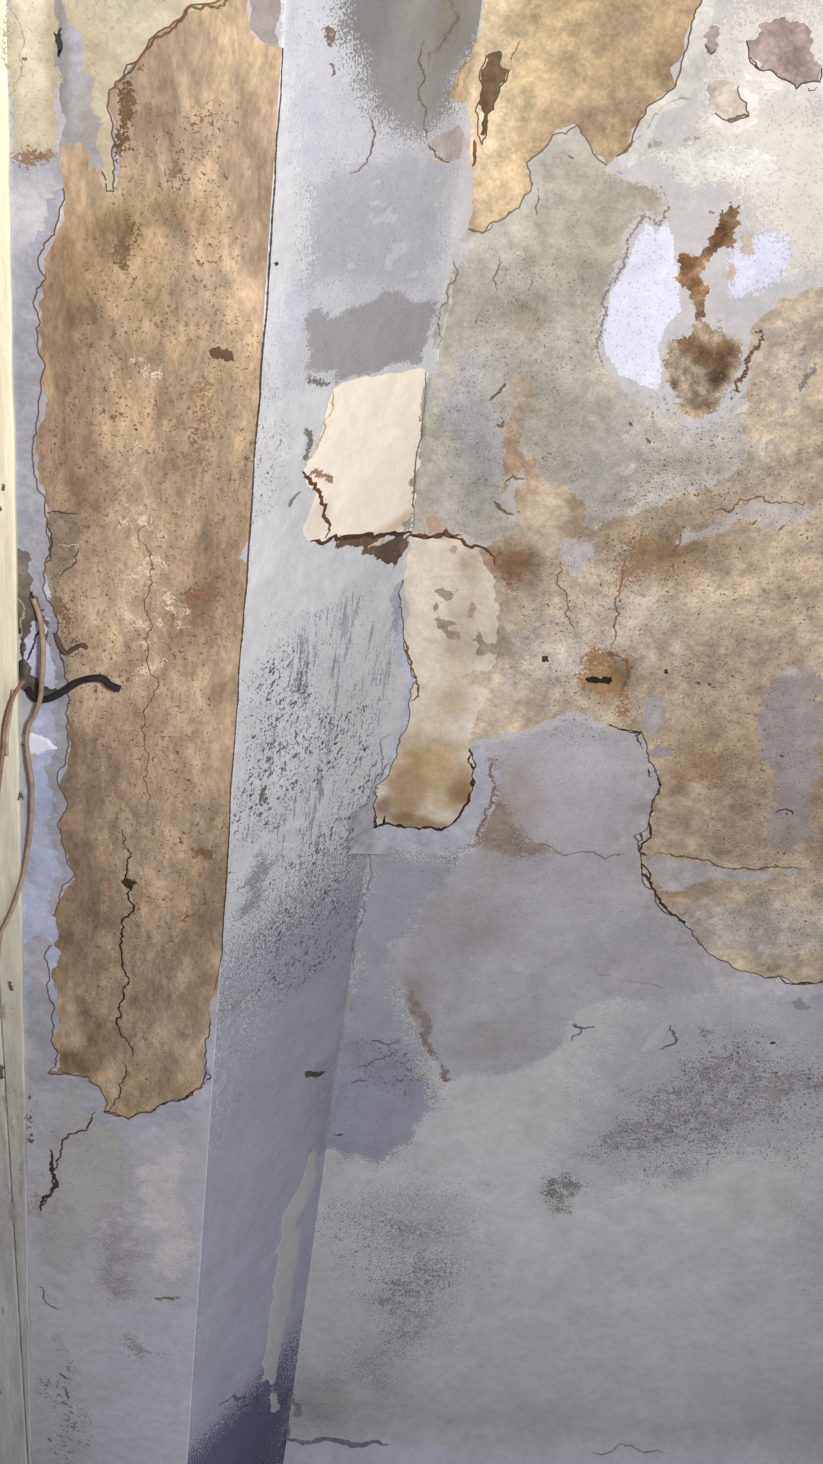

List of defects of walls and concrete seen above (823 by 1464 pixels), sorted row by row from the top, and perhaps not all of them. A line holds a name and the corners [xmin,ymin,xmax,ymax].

peeling [322,25,337,77]
flaking render [447,0,823,243]
peeling [602,222,682,393]
rust [662,202,765,419]
peeling [720,226,796,305]
flaking render [10,0,284,1134]
crack [39,514,160,1211]
flaking render [187,287,823,1464]
peeling [0,1065,76,1257]